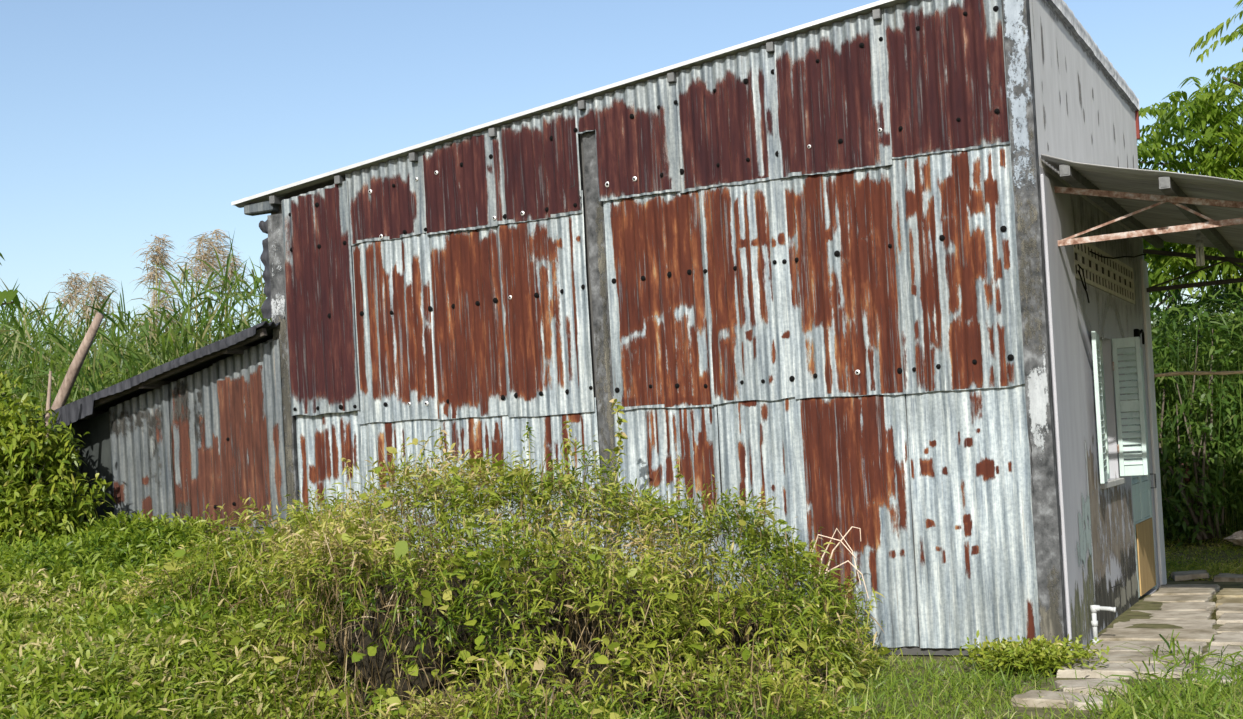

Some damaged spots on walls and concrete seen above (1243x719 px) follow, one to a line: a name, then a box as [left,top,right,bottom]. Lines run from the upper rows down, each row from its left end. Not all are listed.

corrosion [285,0,1014,619]
corrosion [113,482,124,504]
corrosion [142,476,153,520]
corrosion [155,365,281,535]
peeling [1027,346,1049,452]
corrosion [1027,600,1035,641]
leakage [1039,545,1139,651]